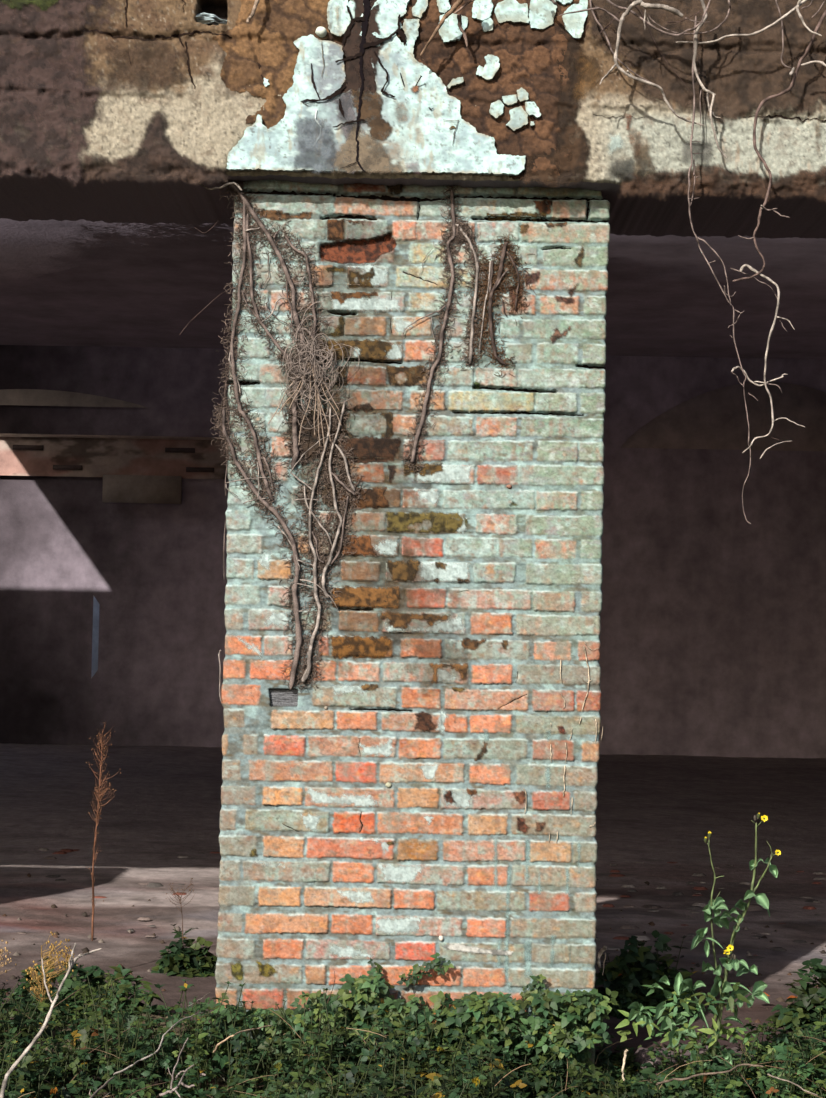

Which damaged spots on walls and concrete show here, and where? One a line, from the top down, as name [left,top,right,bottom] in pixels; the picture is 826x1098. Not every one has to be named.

crack [86,0,232,89]
crack [300,0,406,172]
peeling [212,0,590,180]
water stain [255,209,312,221]
water stain [487,200,567,234]
spalling [320,234,396,264]
water stain [295,265,426,387]
water stain [289,403,486,659]
water stain [430,663,468,692]
water stain [308,789,377,807]
water stain [360,837,421,882]
water stain [377,916,420,933]